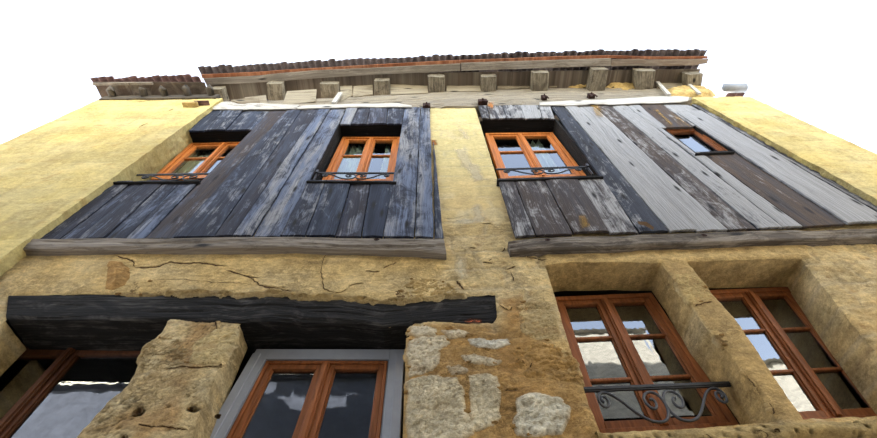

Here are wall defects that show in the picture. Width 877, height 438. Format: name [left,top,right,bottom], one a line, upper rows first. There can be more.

crack [115,255,297,292]
crack [320,255,402,293]
spalling [403,299,585,438]